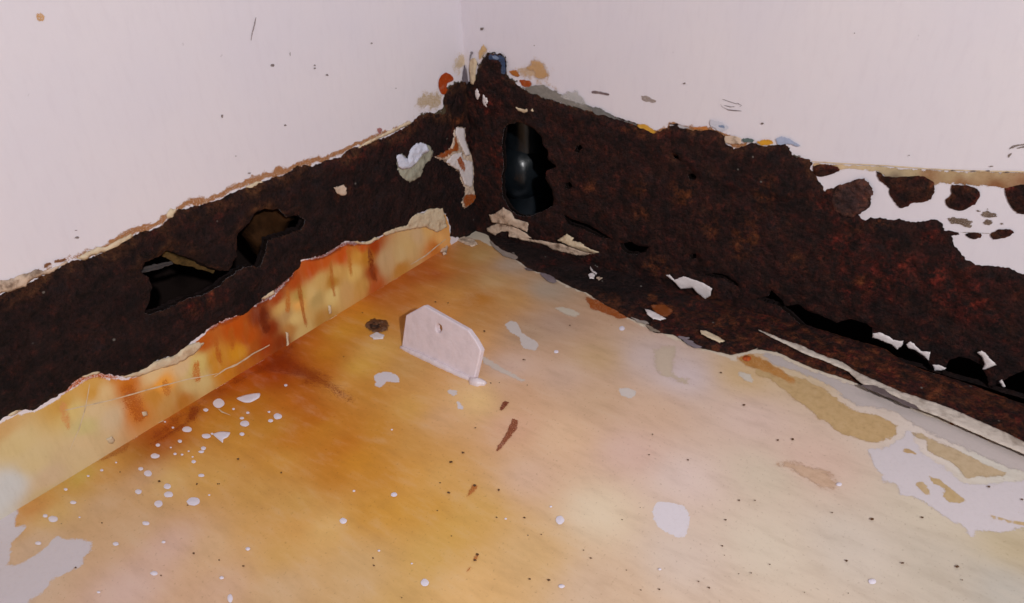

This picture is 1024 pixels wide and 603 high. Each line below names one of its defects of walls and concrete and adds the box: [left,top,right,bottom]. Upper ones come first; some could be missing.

peeling [446,127,474,187]
peeling [948,208,1003,228]
corrosion [0,45,1024,520]